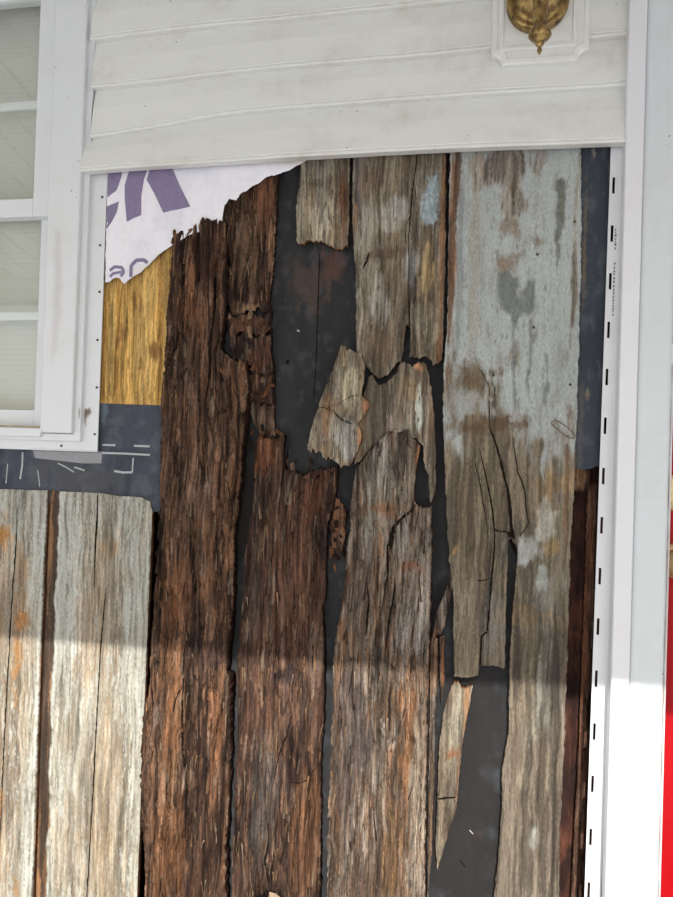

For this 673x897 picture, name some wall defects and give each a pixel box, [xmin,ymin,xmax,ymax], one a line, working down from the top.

damp [498,272,534,322]
crack [475,365,529,666]